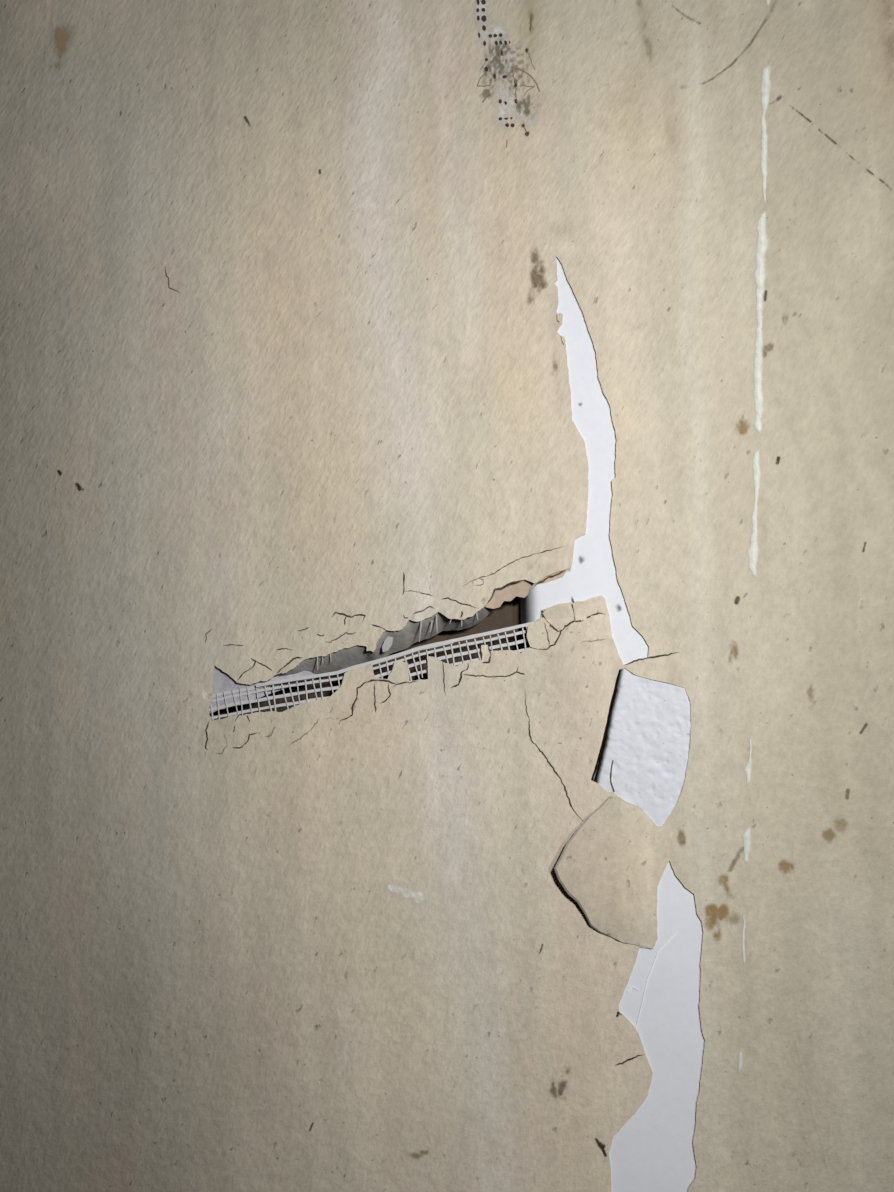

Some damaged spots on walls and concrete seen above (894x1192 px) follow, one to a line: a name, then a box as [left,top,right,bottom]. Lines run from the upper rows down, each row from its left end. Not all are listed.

crack [205,548,603,819]
peeling [520,257,705,1192]
crack [625,652,678,665]